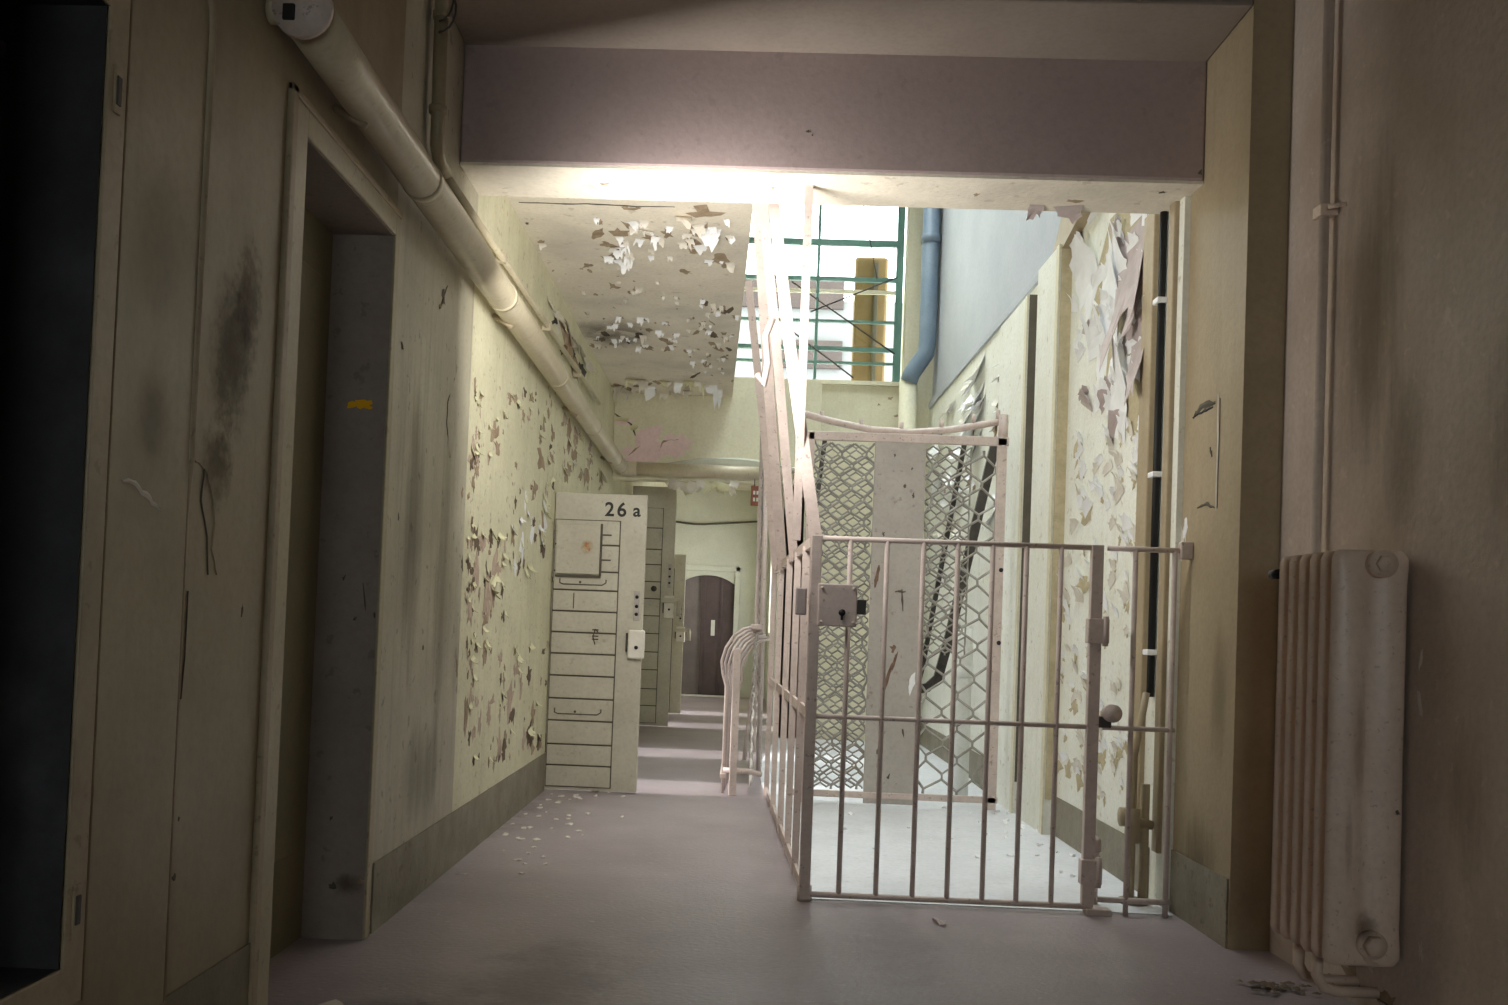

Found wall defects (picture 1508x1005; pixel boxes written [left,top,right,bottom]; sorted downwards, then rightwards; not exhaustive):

peeling [456,377,609,773]
peeling [547,205,739,463]
peeling [668,479,739,496]
peeling [1026,199,1148,807]